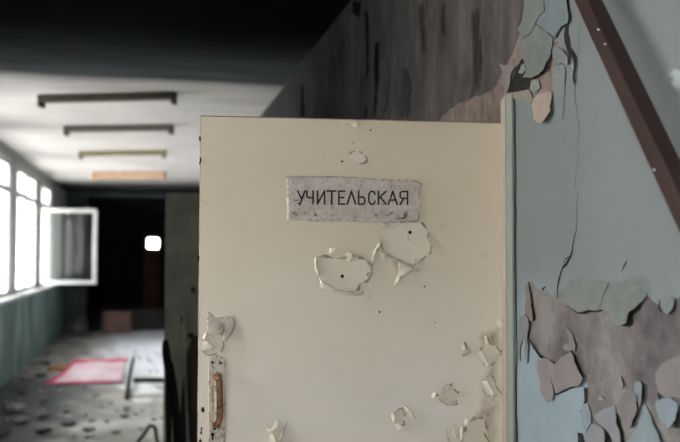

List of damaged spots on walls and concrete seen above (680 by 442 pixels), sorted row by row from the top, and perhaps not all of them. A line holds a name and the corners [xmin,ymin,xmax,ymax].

peeling [440,0,576,123]
peeling [314,221,433,296]
crack [542,164,578,297]
peeling [201,311,235,356]
peeling [431,383,465,406]
peeling [445,409,492,442]
peeling [461,334,503,404]
peeling [517,277,680,442]